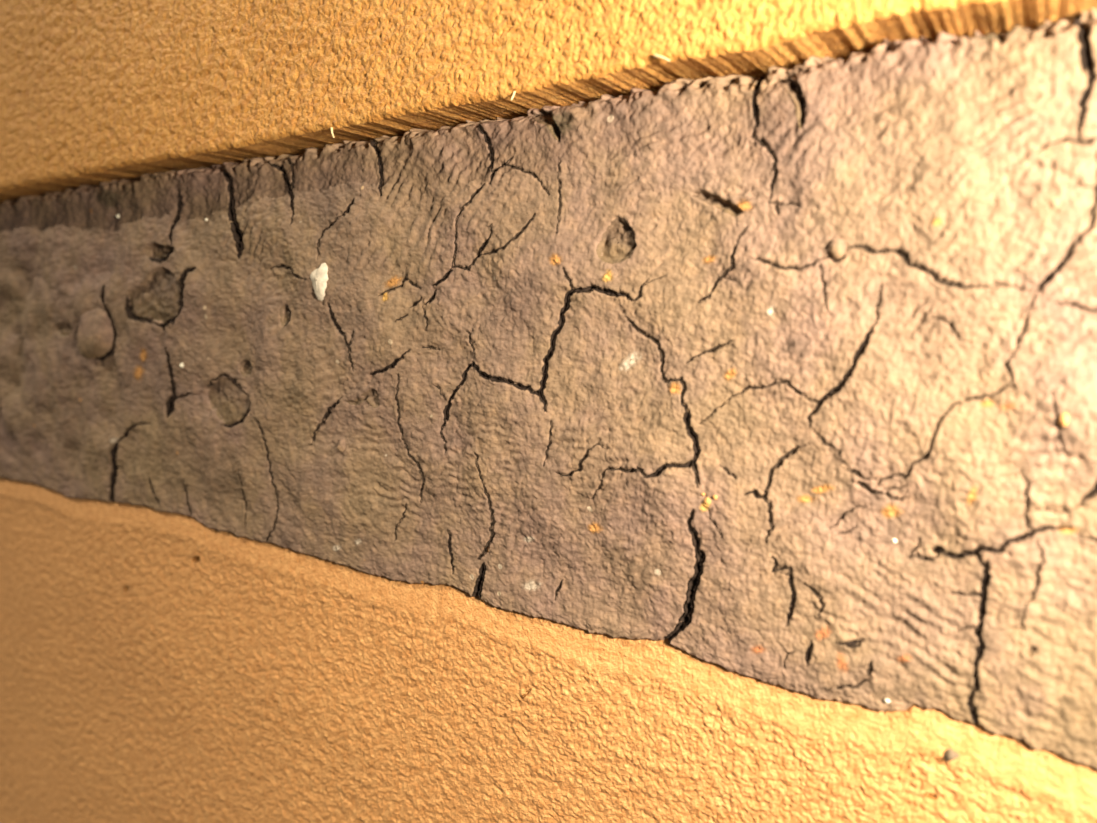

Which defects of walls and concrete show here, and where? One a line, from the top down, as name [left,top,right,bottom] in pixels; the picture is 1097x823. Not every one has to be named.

spalling [532,109,560,141]
spalling [779,79,805,129]
crack [222,171,244,258]
crack [269,157,294,225]
crack [270,199,354,279]
spalling [596,216,636,264]
spalling [692,191,742,217]
spalling [125,244,195,331]
crack [109,347,197,502]
spalling [206,359,252,428]
crack [327,122,561,542]
crack [433,14,1097,724]